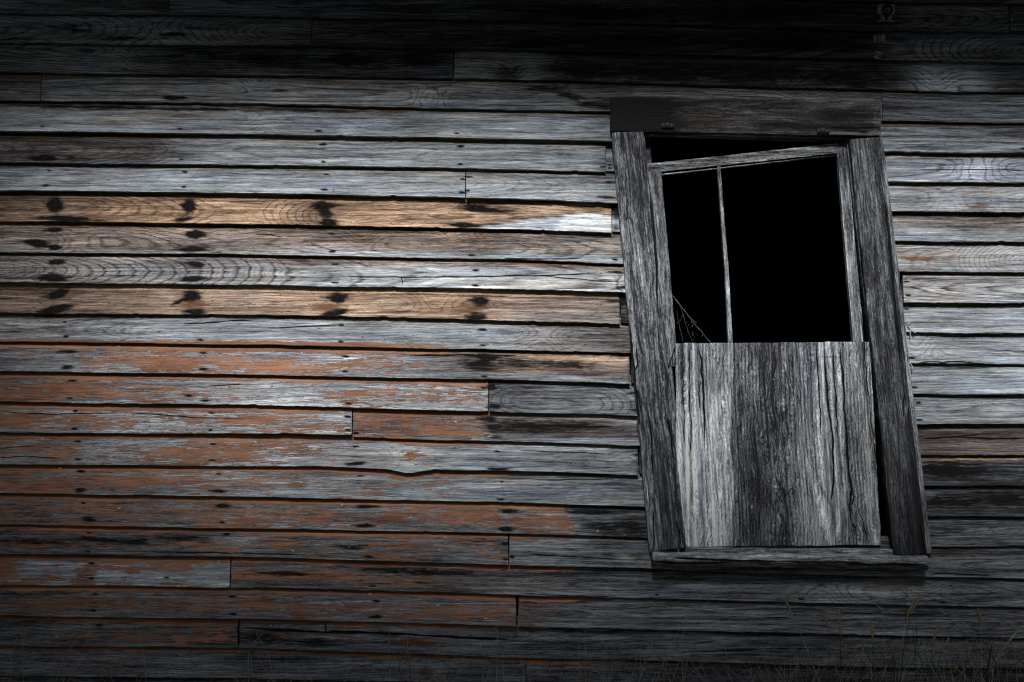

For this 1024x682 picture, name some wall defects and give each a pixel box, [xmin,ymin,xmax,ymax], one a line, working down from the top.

peeling [0,328,651,681]
damp [463,356,594,390]
crack [652,312,989,576]